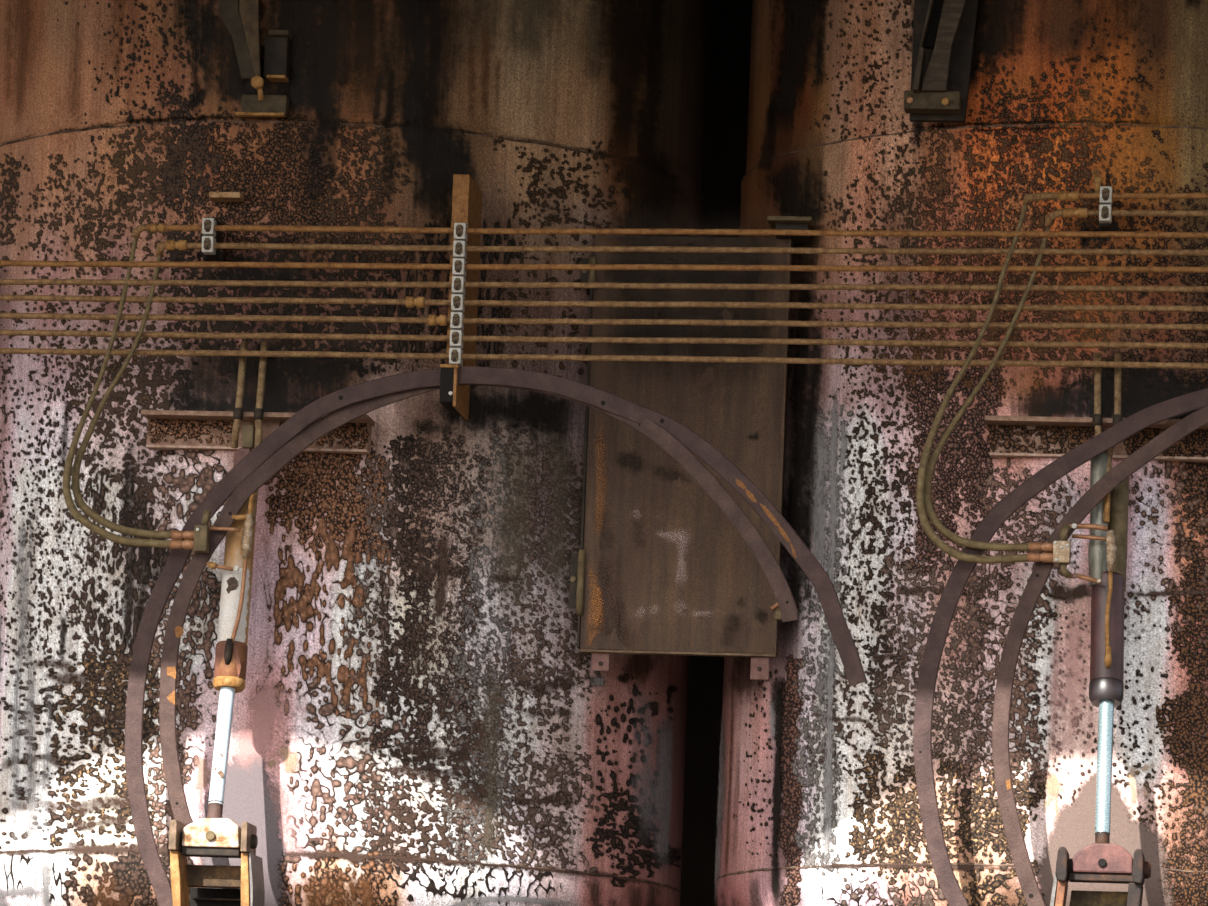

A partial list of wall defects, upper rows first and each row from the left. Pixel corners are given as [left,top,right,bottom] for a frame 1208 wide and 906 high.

leakage [175,0,475,226]
leakage [759,0,826,222]
peeling [0,354,24,563]
peeling [149,450,227,531]
rust [0,0,450,906]
rust [720,0,1208,906]
peeling [178,567,222,774]
peeling [198,441,601,906]
rust [278,422,684,906]